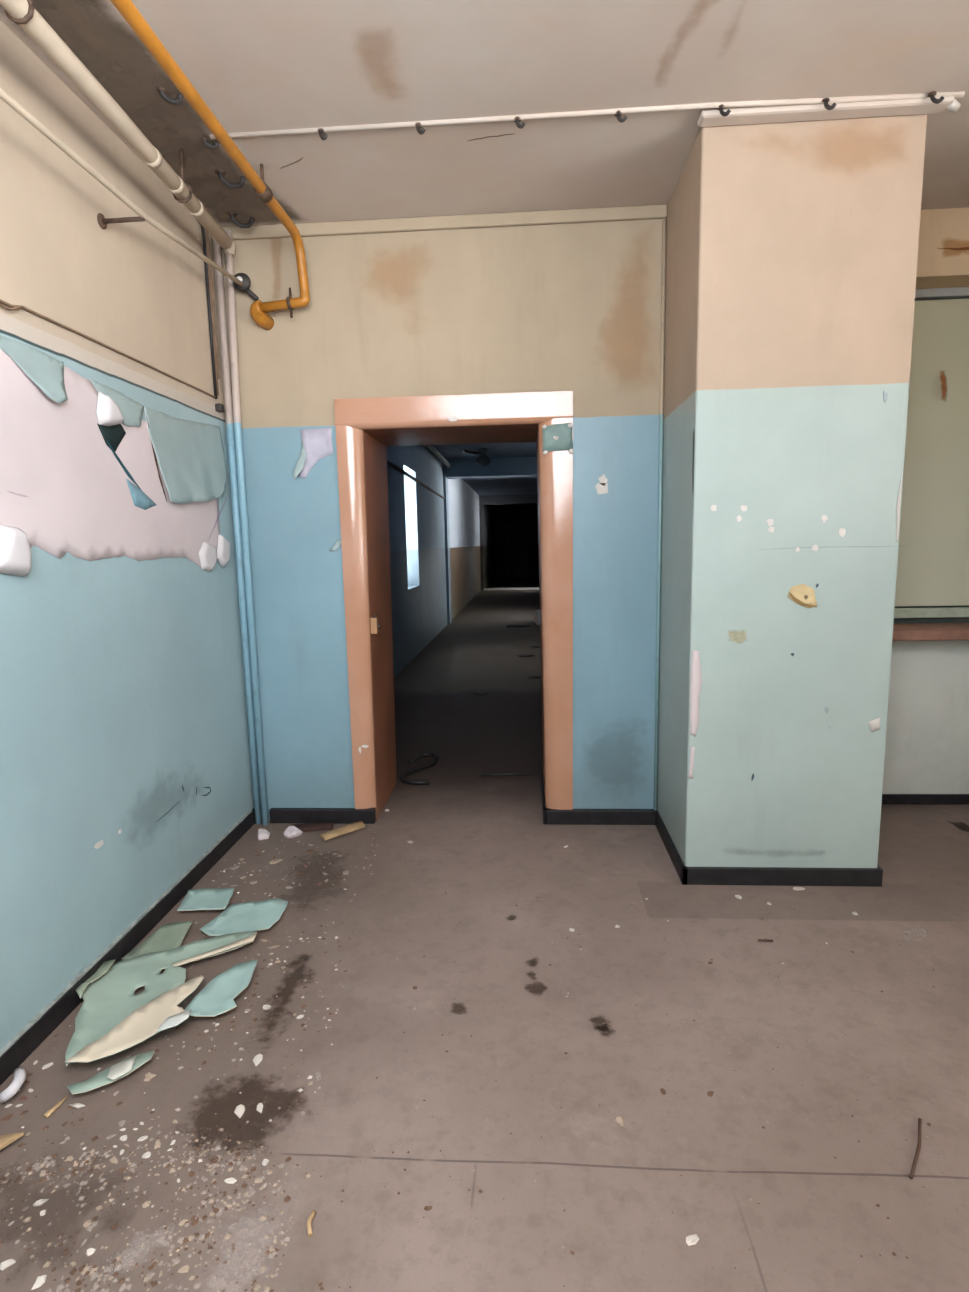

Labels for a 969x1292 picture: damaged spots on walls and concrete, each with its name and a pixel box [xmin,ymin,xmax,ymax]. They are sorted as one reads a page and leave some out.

crack [938,244,969,252]
peeling [0,335,230,577]
peeling [293,428,333,479]
flaking render [787,583,819,609]
flaking render [688,650,702,779]